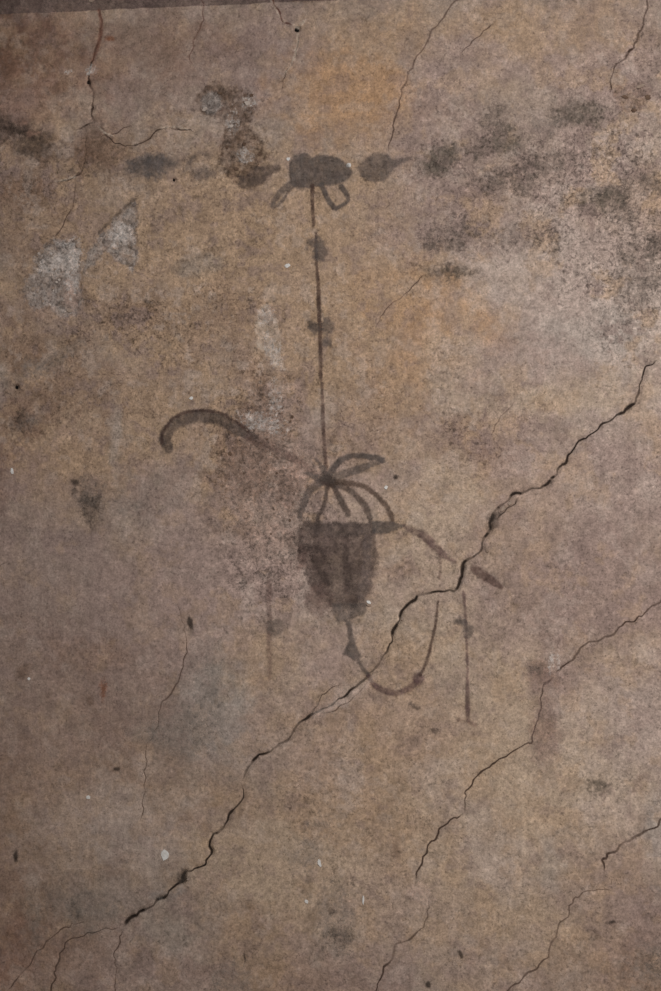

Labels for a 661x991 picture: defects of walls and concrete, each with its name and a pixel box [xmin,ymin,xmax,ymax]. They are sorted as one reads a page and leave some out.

crack [84,52,192,146]
spalling [26,202,139,314]
crack [386,363,654,653]
crack [300,685,358,722]
crack [416,659,572,876]
crack [11,789,244,991]
crack [507,958,547,991]